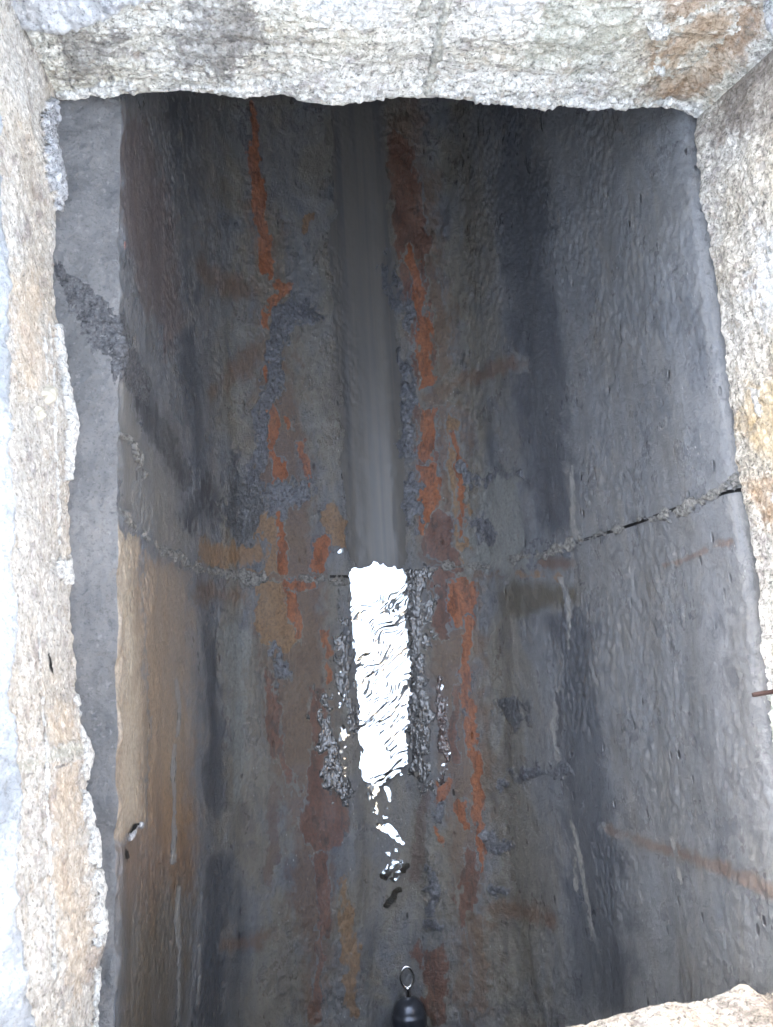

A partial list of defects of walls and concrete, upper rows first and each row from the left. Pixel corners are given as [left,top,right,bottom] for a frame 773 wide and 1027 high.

corrosion [244,98,295,330]
corrosion [266,403,314,487]
corrosion [33,525,214,1027]
corrosion [245,500,349,654]
corrosion [259,626,364,1027]
spalling [306,607,361,809]
spalling [404,561,448,824]
corrosion [380,97,513,1027]
corrosion [752,663,773,697]